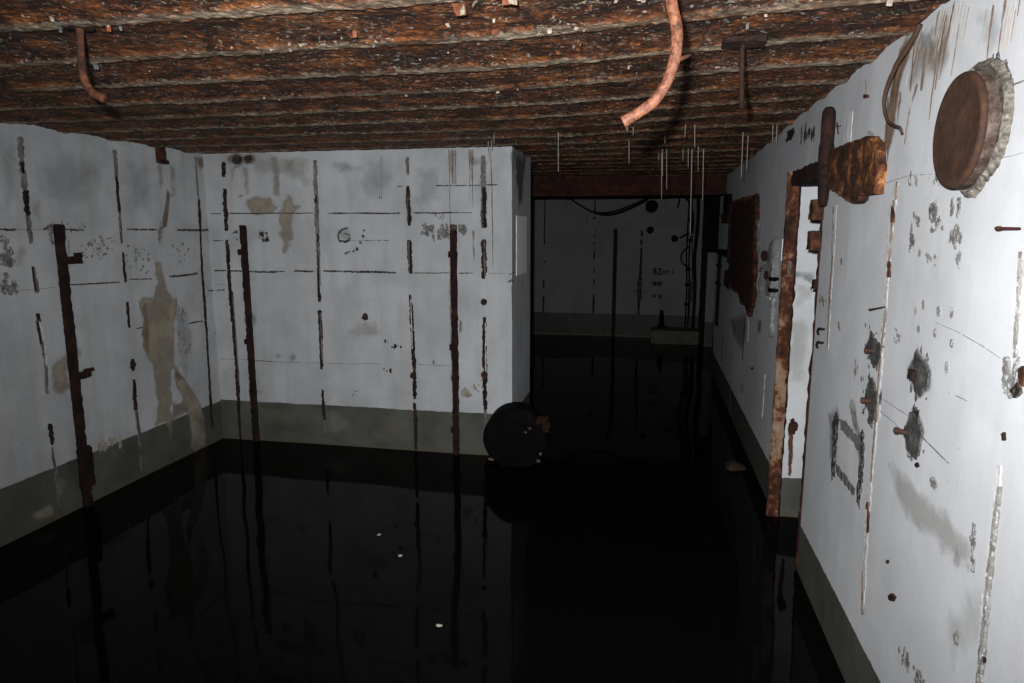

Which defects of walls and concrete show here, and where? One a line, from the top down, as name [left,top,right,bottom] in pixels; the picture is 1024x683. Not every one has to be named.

leakage [158,191,170,244]
leakage [248,158,298,252]
leakage [140,263,206,451]
corrosion [787,418,798,476]